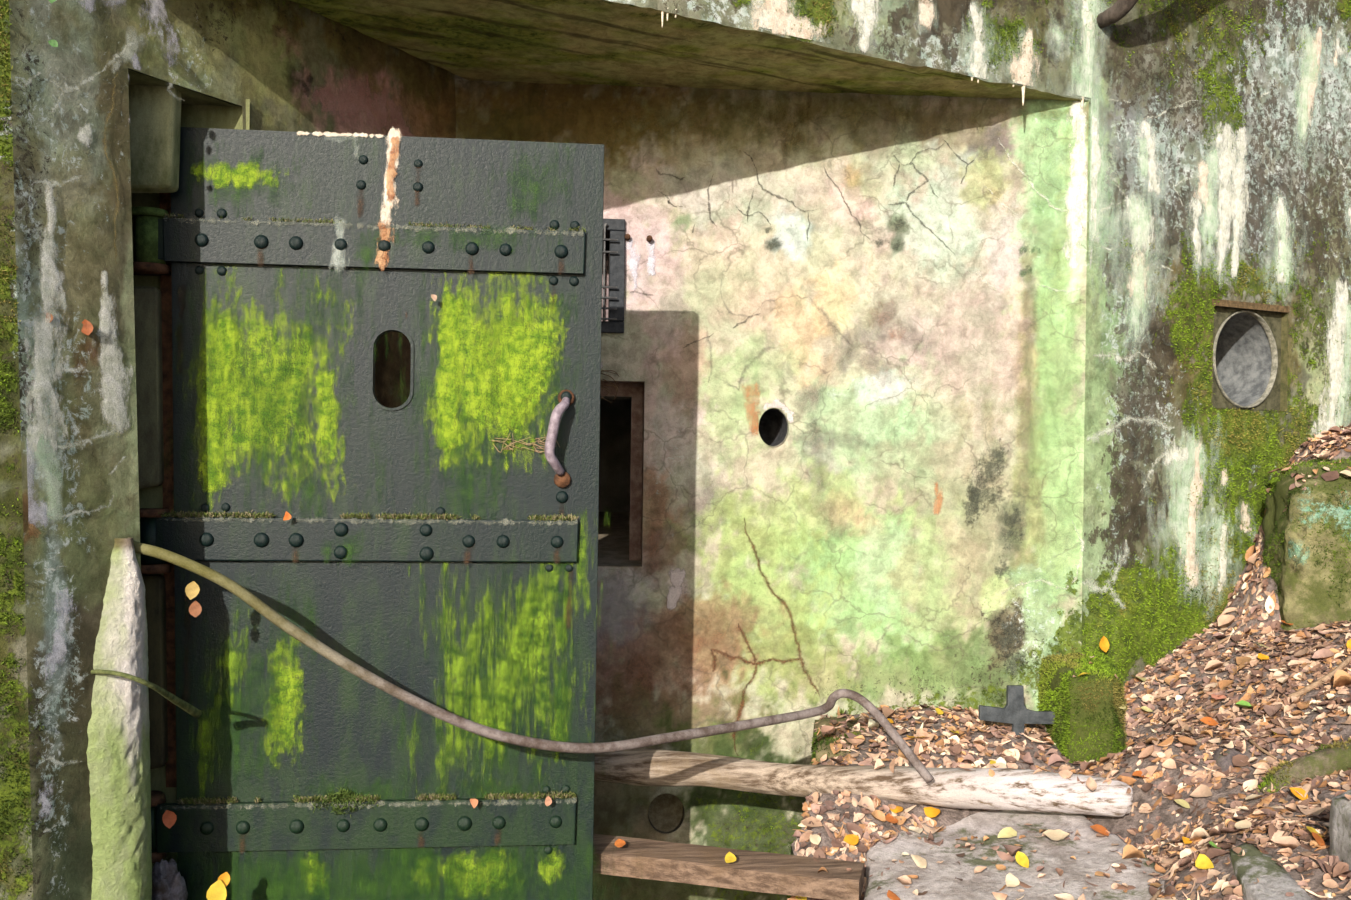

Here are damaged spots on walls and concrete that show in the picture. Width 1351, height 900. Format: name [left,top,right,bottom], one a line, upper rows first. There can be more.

crack [656,156,810,241]
crack [890,141,1066,290]
leakage [1115,122,1163,337]
leakage [1190,123,1249,276]
leakage [1267,199,1291,283]
leakage [24,183,68,525]
leakage [97,271,133,433]
rust [745,383,759,434]
leakage [1312,278,1351,435]
leakage [963,438,1022,542]
leakage [1162,433,1252,593]
crack [711,519,817,755]